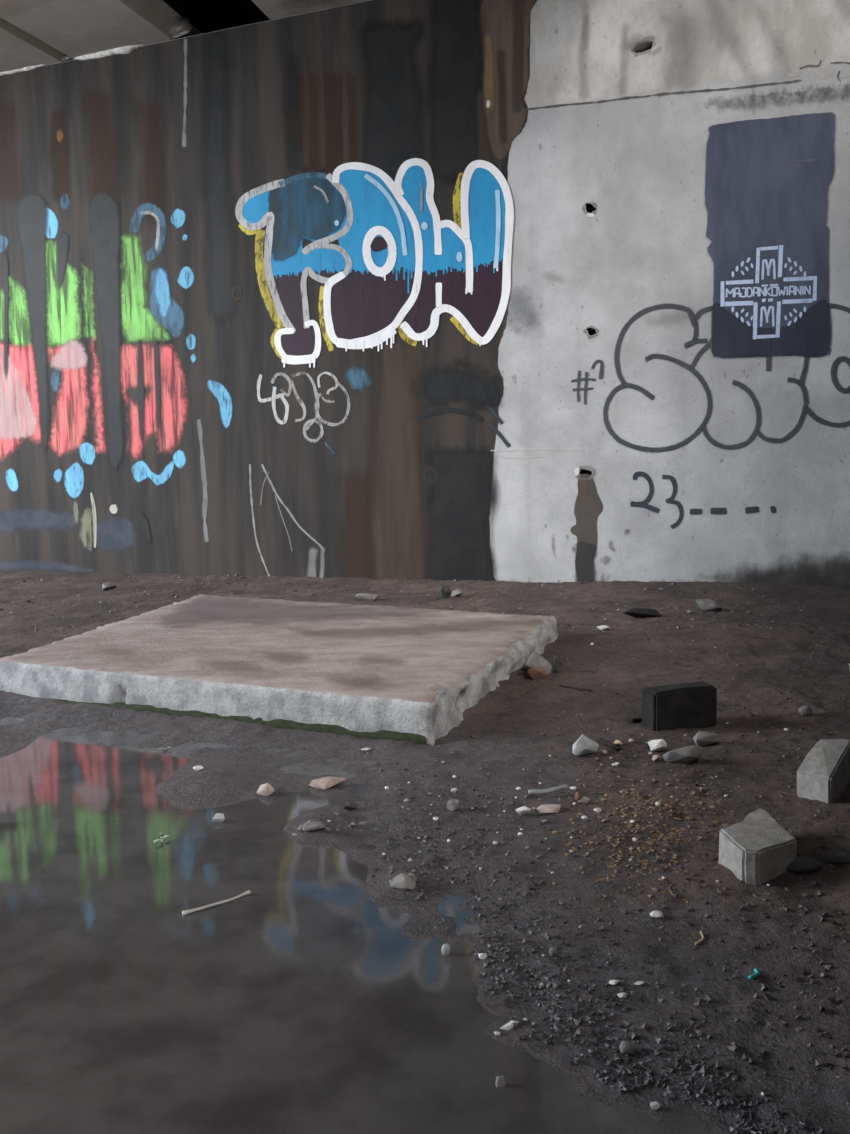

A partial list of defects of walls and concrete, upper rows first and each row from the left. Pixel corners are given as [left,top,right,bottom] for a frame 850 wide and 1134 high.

hole [631,36,655,56]
crack [493,60,850,113]
spalling [583,203,597,217]
leakage [0,0,537,581]
leakage [571,474,603,582]
leakage [717,558,850,588]